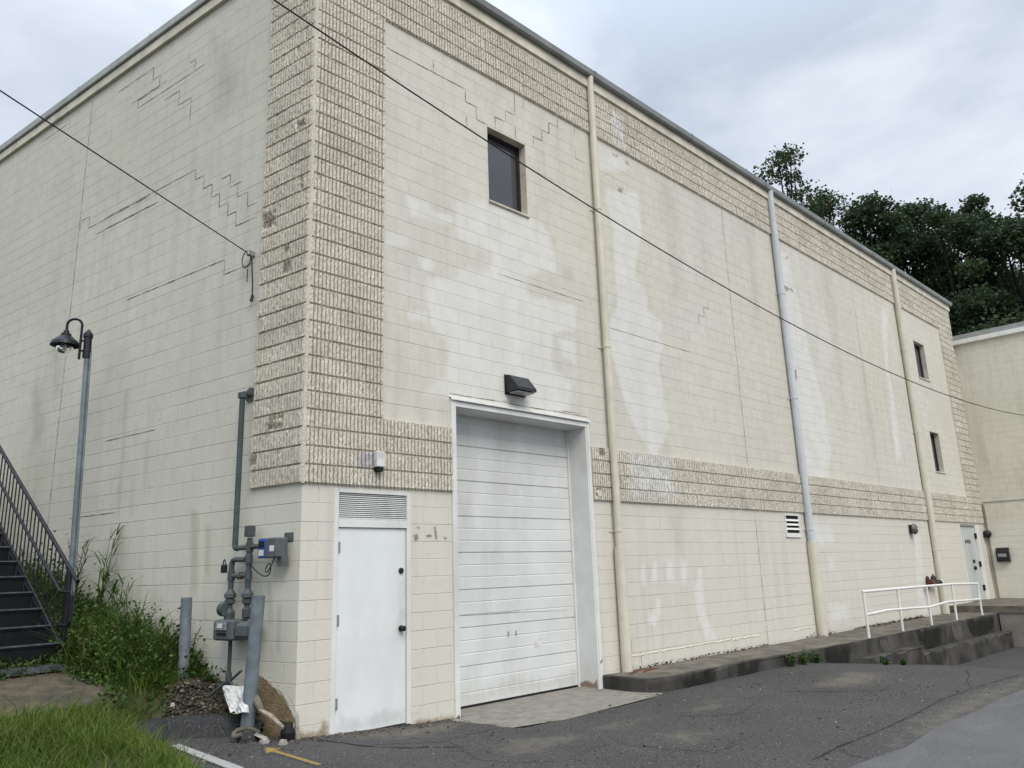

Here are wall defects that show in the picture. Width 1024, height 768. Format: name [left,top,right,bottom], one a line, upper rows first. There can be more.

crack [119,56,205,112]
crack [386,47,579,160]
crack [80,169,255,234]
crack [125,260,250,301]
damp [618,450,720,644]